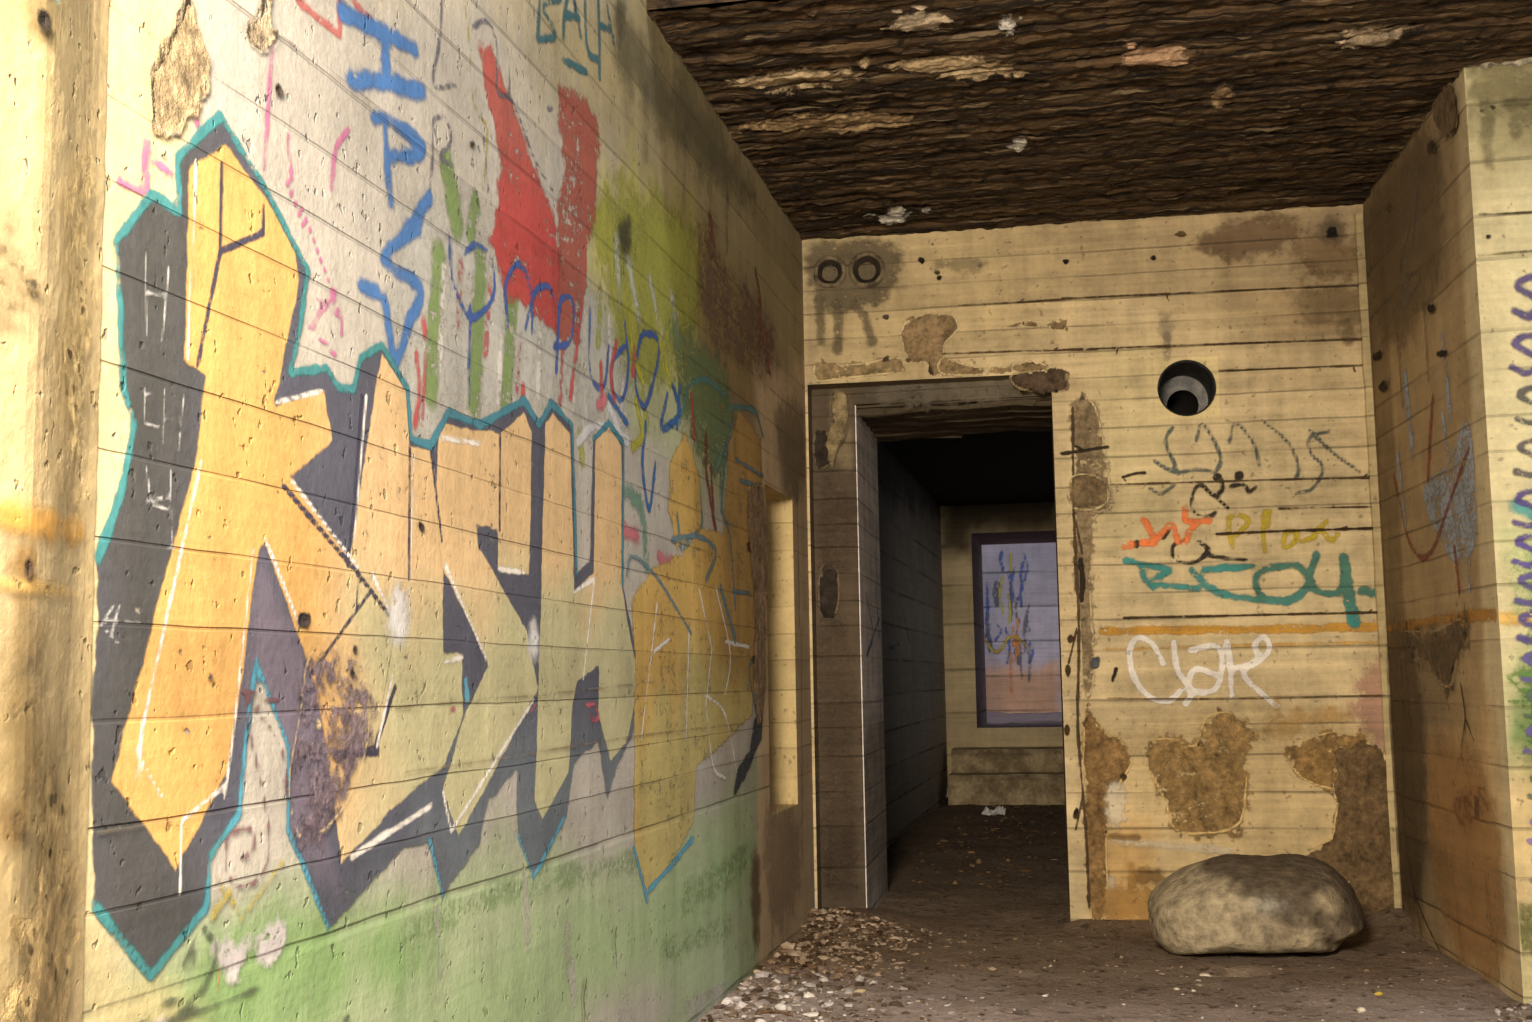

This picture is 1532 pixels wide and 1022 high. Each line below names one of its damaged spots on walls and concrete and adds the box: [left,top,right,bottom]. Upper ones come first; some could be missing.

spalling [246,0,279,53]
peeling [880,5,953,32]
peeling [999,13,1021,33]
spalling [150,0,211,139]
peeling [726,54,1029,94]
peeling [1121,41,1193,67]
peeling [729,111,914,135]
leakage [1196,130,1440,406]
leakage [806,240,901,354]
peeling [812,314,1259,920]
spalling [1284,729,1394,917]